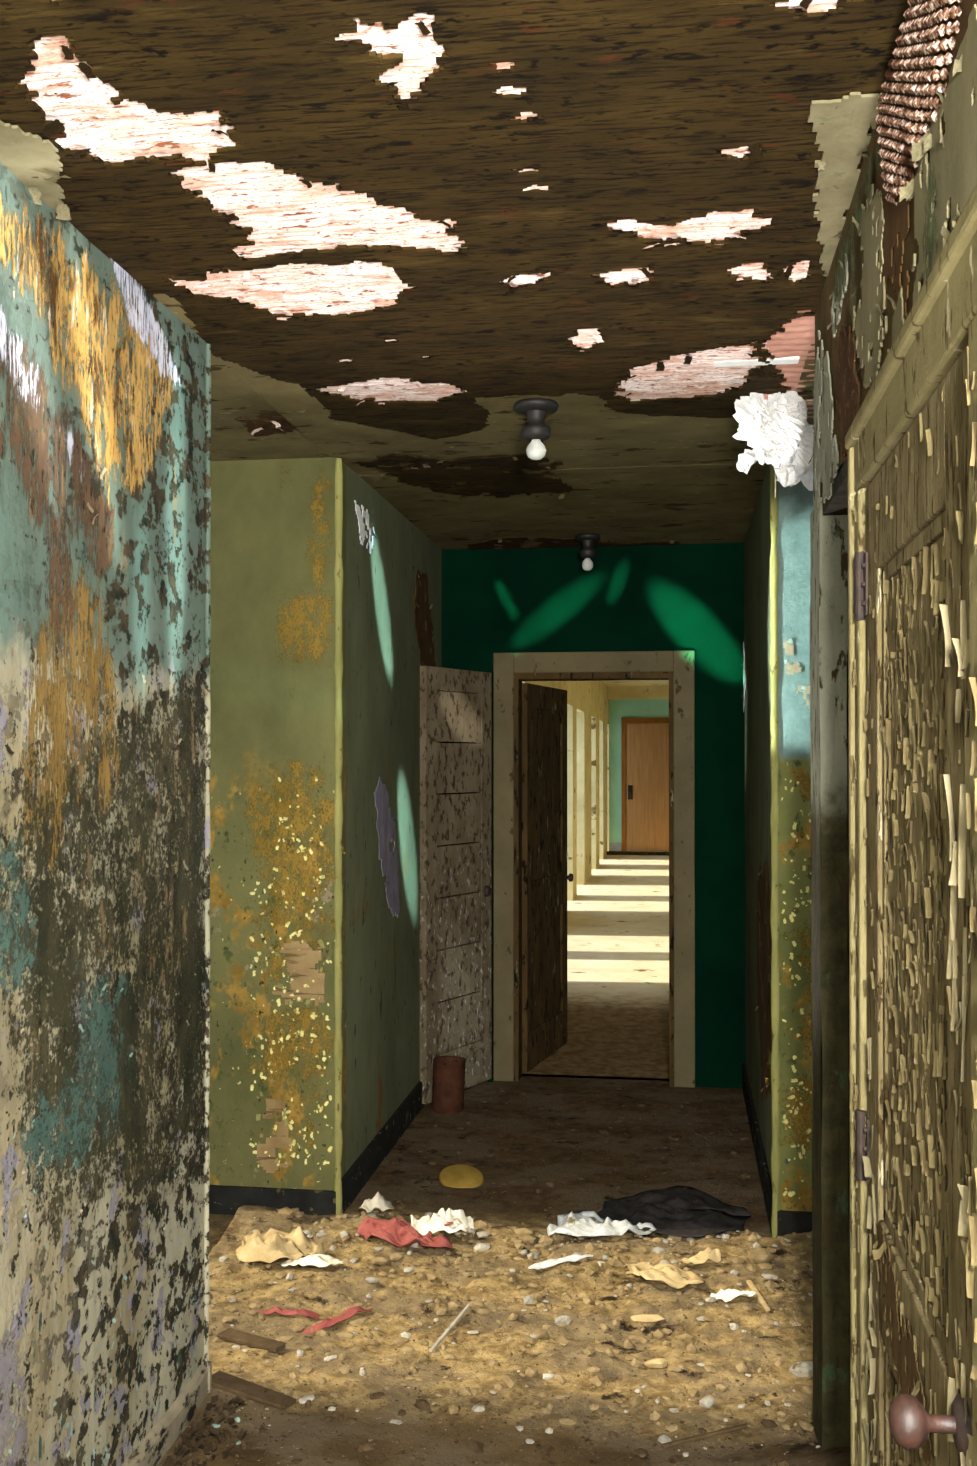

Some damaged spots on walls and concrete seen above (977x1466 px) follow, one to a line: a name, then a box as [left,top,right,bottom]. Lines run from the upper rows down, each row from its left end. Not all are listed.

spalling [335,13,445,106]
spalling [0,36,469,320]
spalling [607,209,772,249]
leakage [111,260,180,387]
spalling [600,267,654,287]
spalling [614,342,777,402]
peeling [783,639,810,712]
leakage [0,305,215,1260]
peeling [848,346,977,1466]